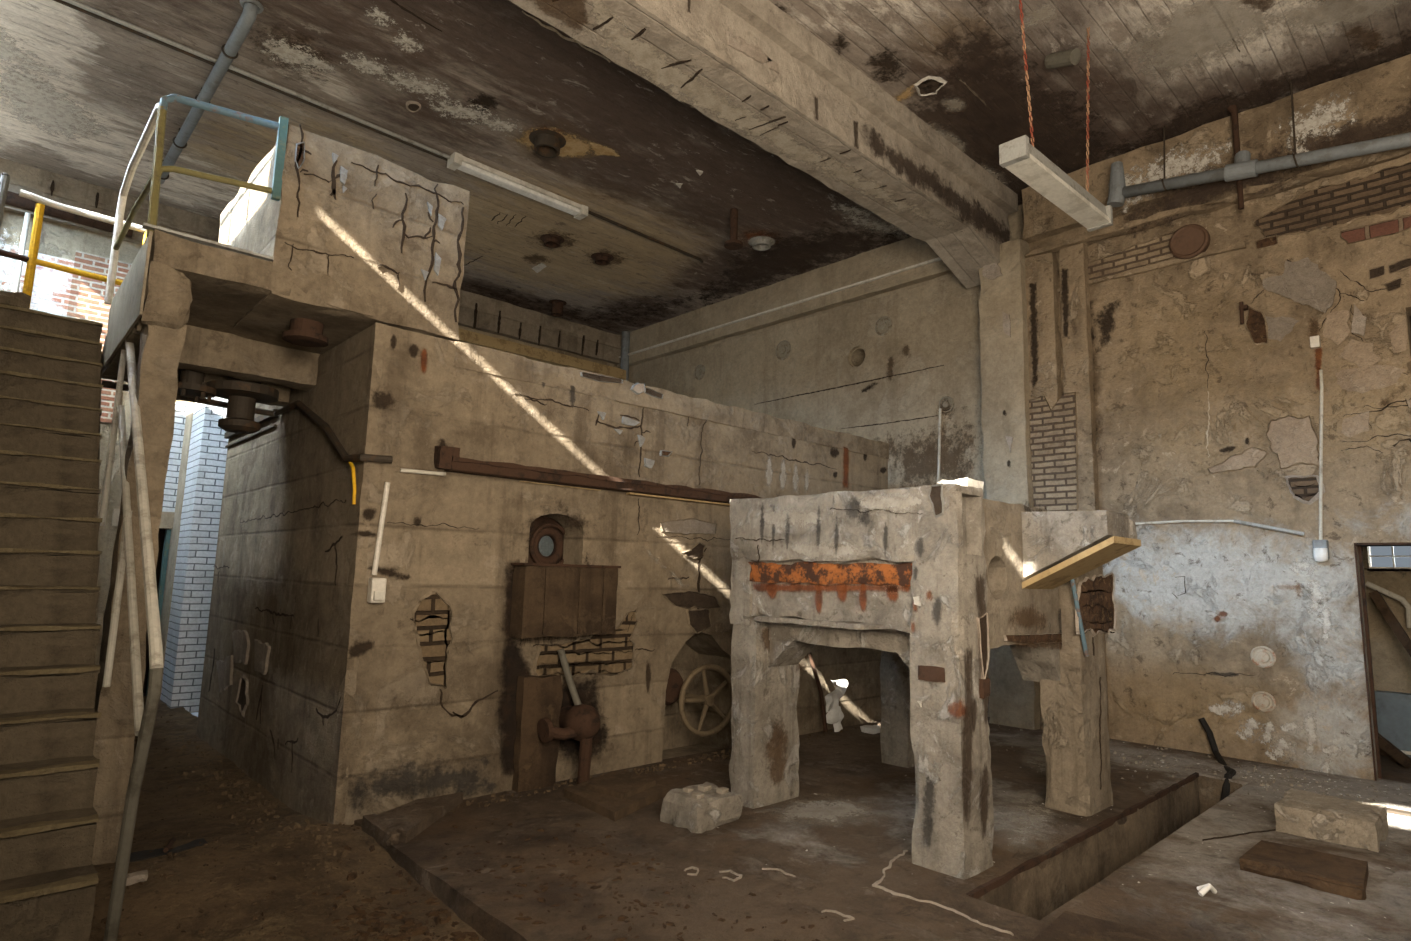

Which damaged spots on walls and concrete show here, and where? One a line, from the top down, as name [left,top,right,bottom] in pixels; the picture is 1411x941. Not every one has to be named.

damp [1108,0,1411,238]
crack [285,124,599,356]
spalling [1088,230,1177,280]
spalling [1252,162,1411,249]
spalling [1028,392,1078,511]
peeling [1207,415,1325,505]
crack [1341,373,1411,453]
spalling [412,591,453,689]
corrosion [753,583,932,631]